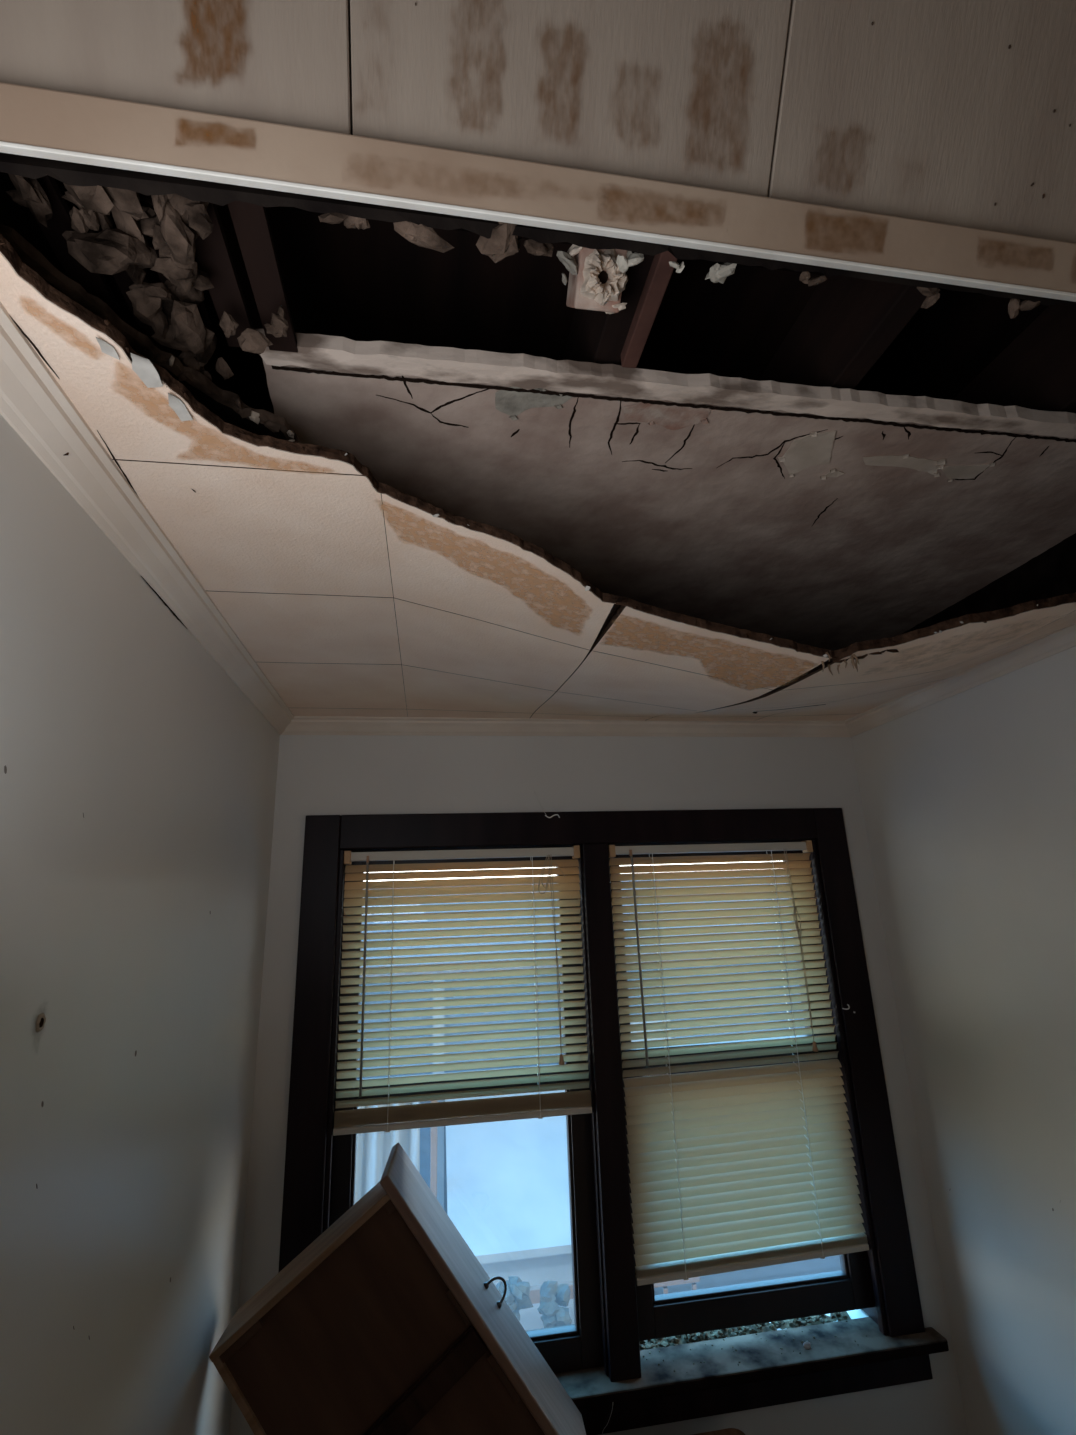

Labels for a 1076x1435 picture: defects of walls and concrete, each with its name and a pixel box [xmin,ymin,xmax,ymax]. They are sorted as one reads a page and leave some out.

leakage [183,0,246,80]
flaking render [0,152,1076,452]
crack [377,376,489,428]
crack [568,397,579,448]
crack [608,401,843,479]
peeling [863,454,945,477]
crack [592,597,625,646]
peeling [823,641,899,663]
crack [752,661,833,714]